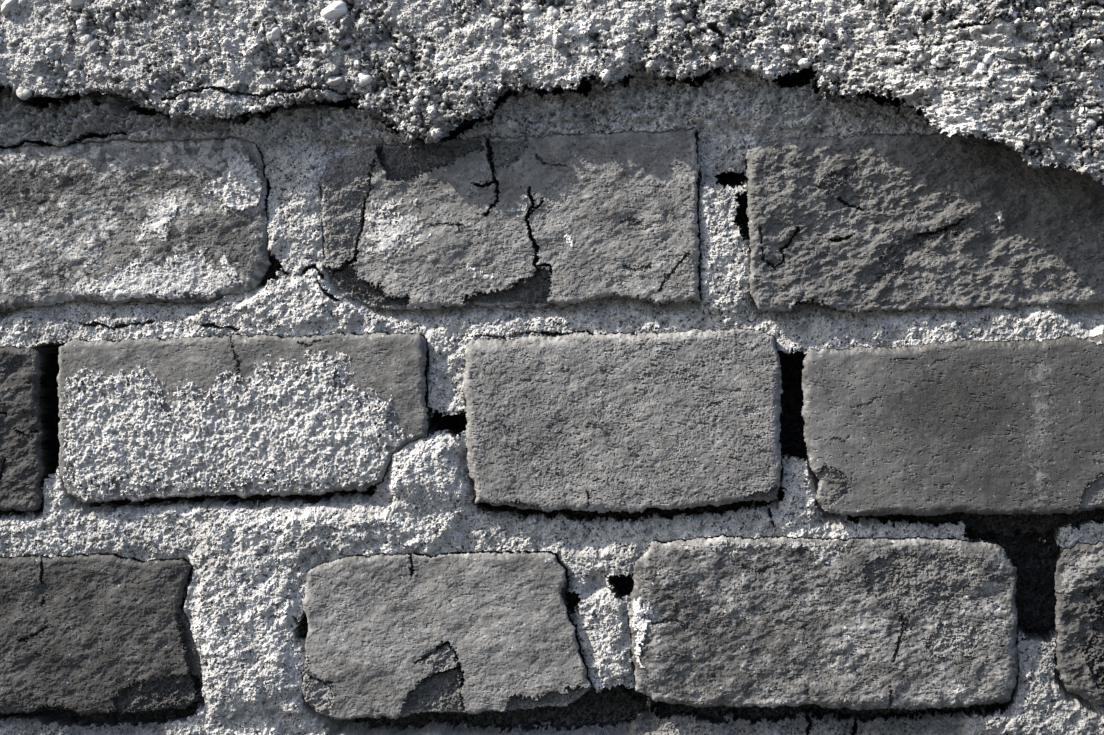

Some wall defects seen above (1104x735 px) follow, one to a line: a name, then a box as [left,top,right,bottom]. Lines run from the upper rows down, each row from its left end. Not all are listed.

peeling [135,190,179,243]
peeling [201,152,263,213]
spalling [322,138,528,306]
crack [430,141,500,231]
crack [524,187,552,269]
peeling [76,248,250,301]
spalling [462,263,552,304]
peeling [60,350,414,501]
spalling [109,613,202,711]
spalling [399,640,465,714]
peeling [632,596,653,668]
spalling [859,549,1003,634]